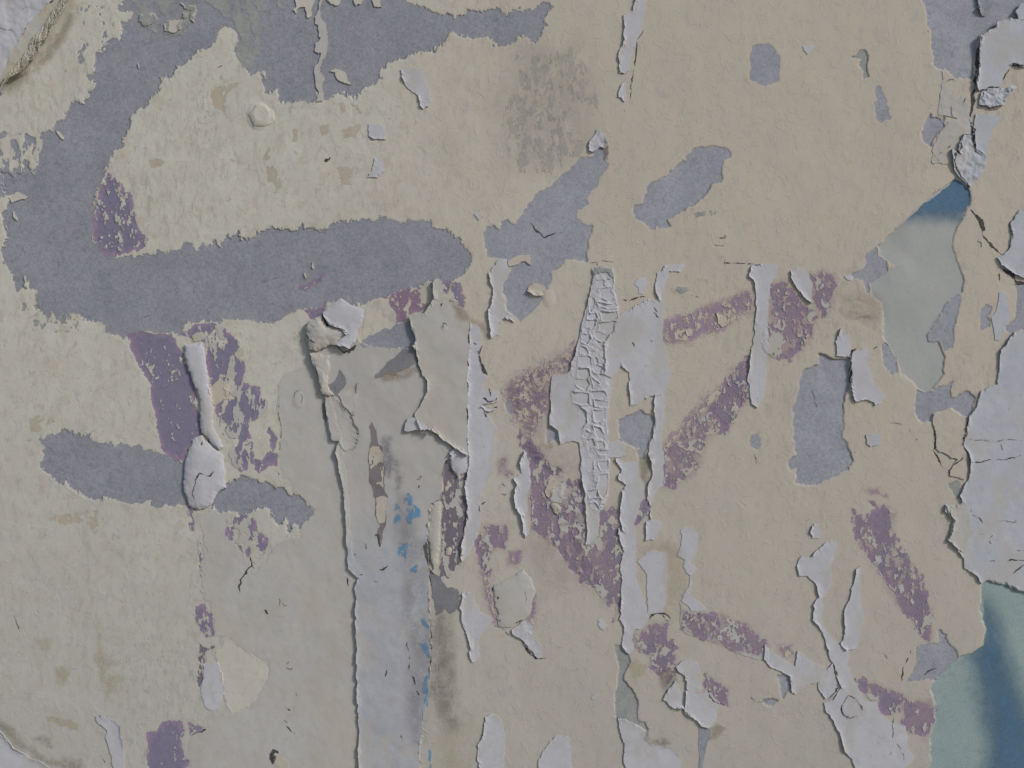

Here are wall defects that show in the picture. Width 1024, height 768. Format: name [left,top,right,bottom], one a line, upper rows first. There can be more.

crack [238,557,254,591]
peeling [0,0,553,533]
flaking render [618,0,646,102]
peeling [427,129,915,768]
flaking render [788,0,1024,768]
crack [970,509,1024,574]